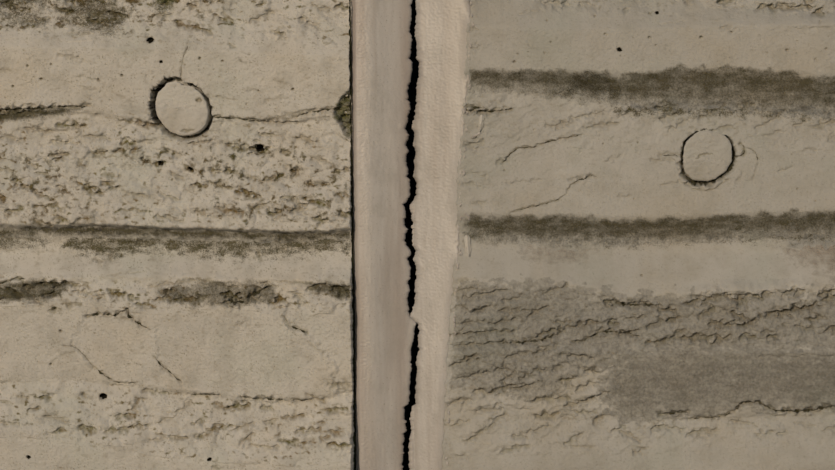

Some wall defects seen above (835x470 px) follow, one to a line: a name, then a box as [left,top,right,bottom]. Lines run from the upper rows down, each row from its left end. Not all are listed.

leakage [471,65,835,121]
leakage [0,226,350,263]
crack [149,0,356,470]
crack [402,0,420,470]
leakage [467,210,835,243]
crack [91,311,147,328]
crack [663,401,832,419]